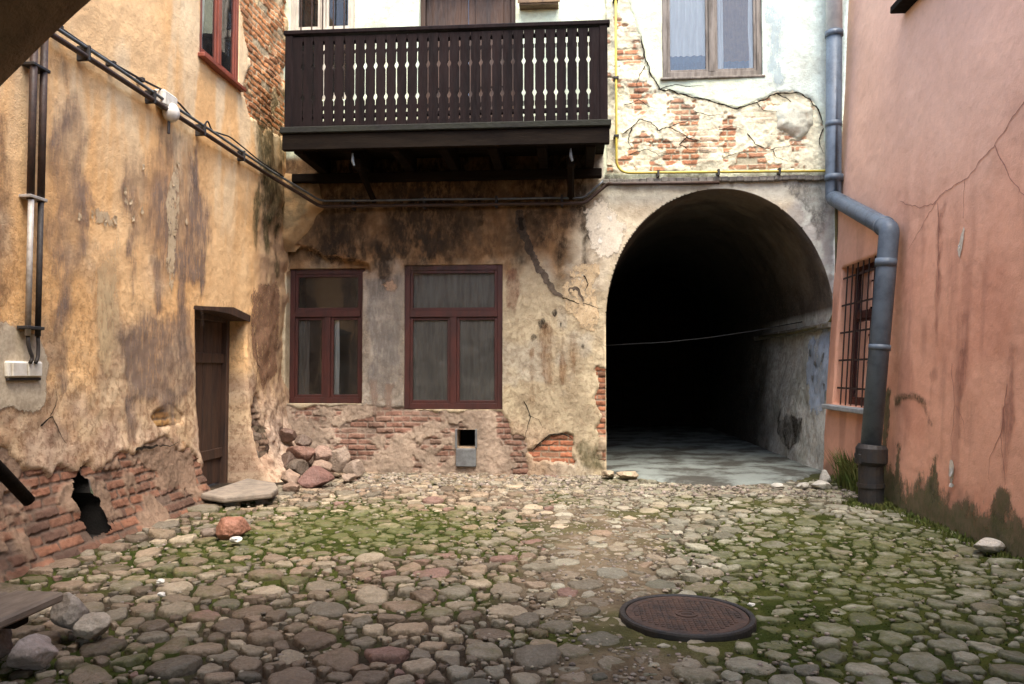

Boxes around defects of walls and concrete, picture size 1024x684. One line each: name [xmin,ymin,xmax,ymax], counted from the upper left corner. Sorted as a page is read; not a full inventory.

flaking render [239,0,288,137]
flaking render [606,0,825,173]
crack [623,36,824,161]
damp [54,273,70,330]
damp [73,156,91,252]
damp [97,149,209,431]
crack [515,210,605,310]
crack [901,102,1024,278]
flaking render [0,404,214,583]
flaking render [286,403,575,475]